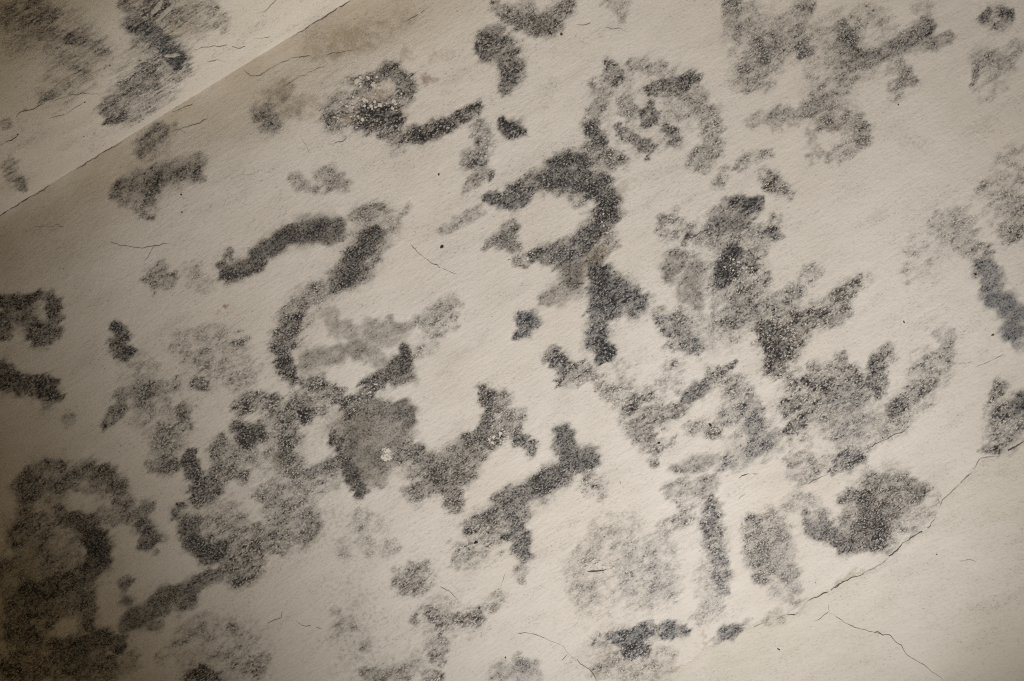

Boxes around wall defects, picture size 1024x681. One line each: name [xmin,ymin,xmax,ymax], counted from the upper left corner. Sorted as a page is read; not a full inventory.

water stain [97,0,228,220]
crack [194,1,350,87]
water stain [474,0,575,97]
water stain [722,0,953,163]
water stain [977,5,1015,30]
water stain [320,57,955,614]
water stain [931,211,1024,349]
water stain [0,203,607,681]
water stain [981,381,1024,455]
crack [784,442,1023,680]
water stain [590,620,698,679]
water stain [716,618,753,645]